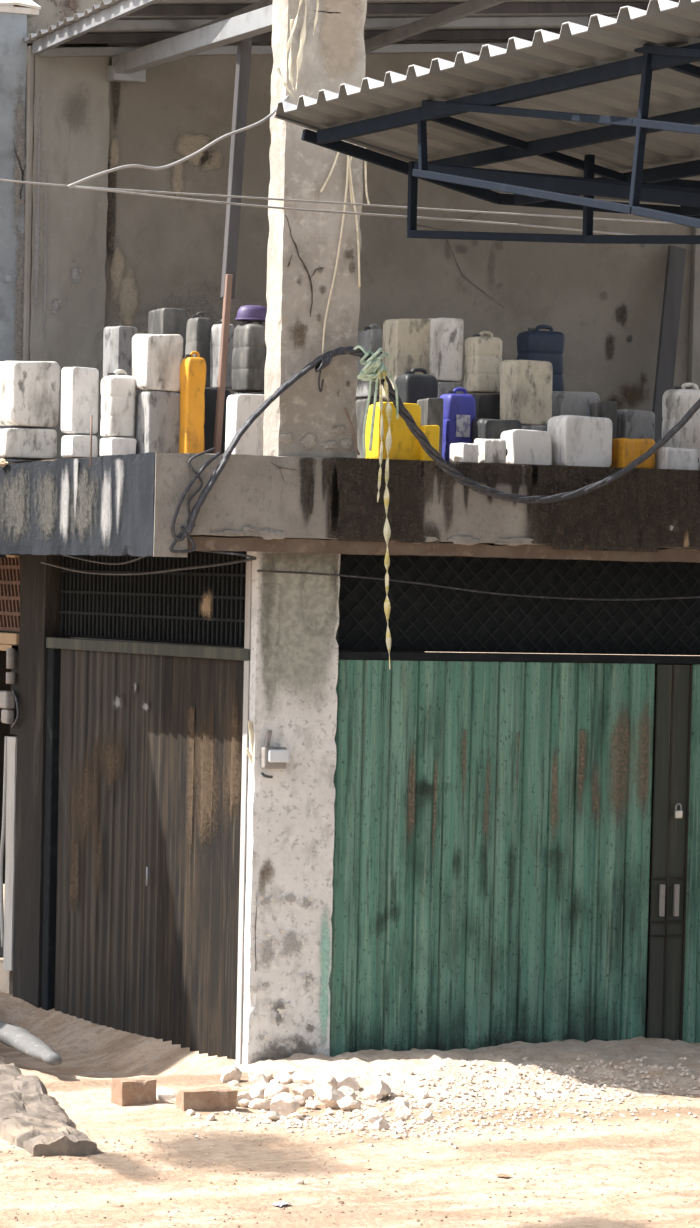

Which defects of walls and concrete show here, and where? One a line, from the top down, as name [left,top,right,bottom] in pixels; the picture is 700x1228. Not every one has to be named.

water stain [0,459,123,539]
water stain [300,457,700,552]
corrosion [187,703,241,839]
corrosion [578,709,650,814]
peeling [256,894,316,911]
peeling [256,930,308,1046]